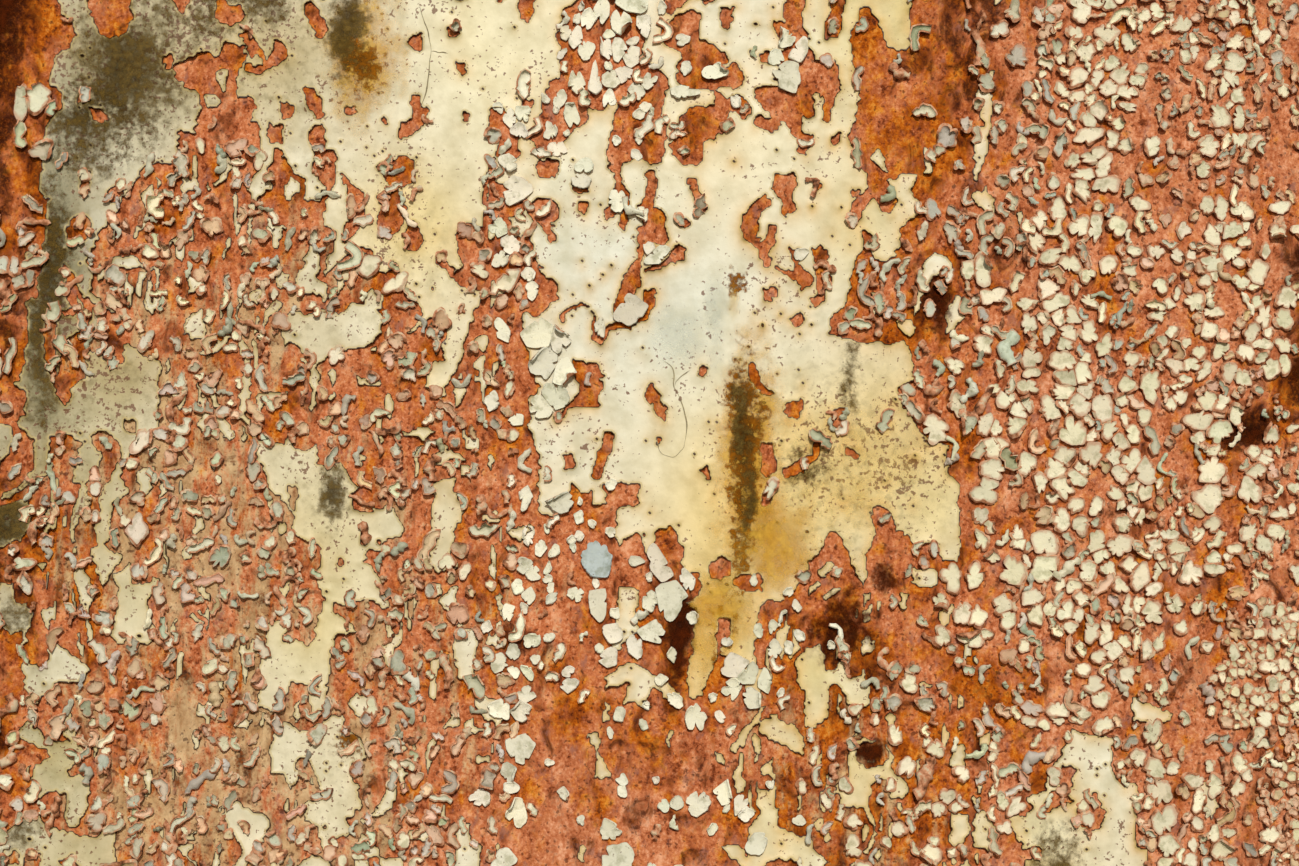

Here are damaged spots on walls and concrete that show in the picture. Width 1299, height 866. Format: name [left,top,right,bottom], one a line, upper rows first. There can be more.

peeling [0,0,751,866]
peeling [543,0,1299,866]
rust [872,564,897,590]
rust [807,590,874,656]
rust [856,744,882,766]